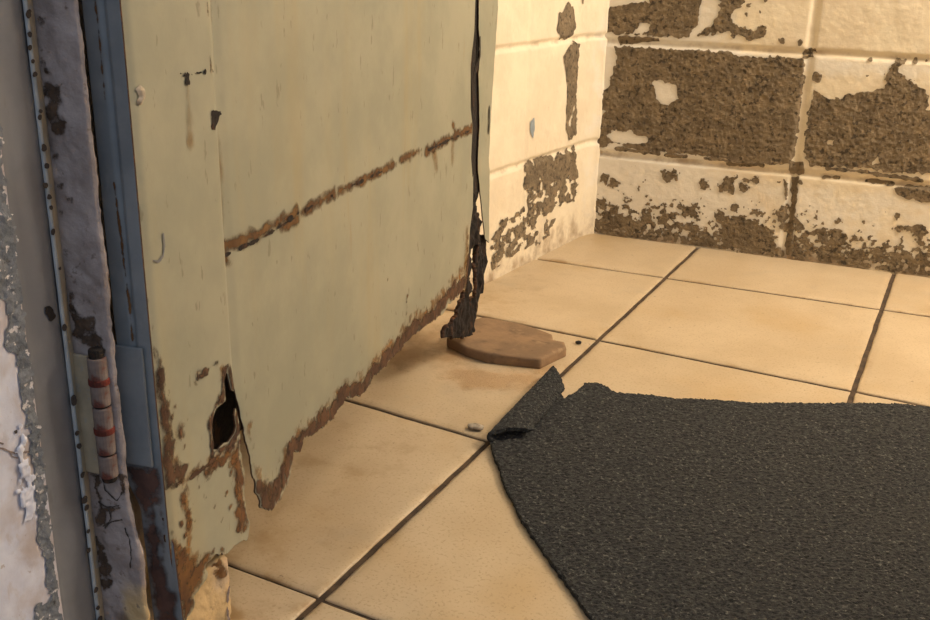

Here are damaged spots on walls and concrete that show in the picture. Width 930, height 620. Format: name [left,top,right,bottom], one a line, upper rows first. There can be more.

corrosion [224,122,472,265]
corrosion [473,36,481,109]
peeling [491,0,584,270]
peeling [594,0,930,276]
corrosion [127,354,228,620]
corrosion [197,361,251,533]
corrosion [256,236,469,511]